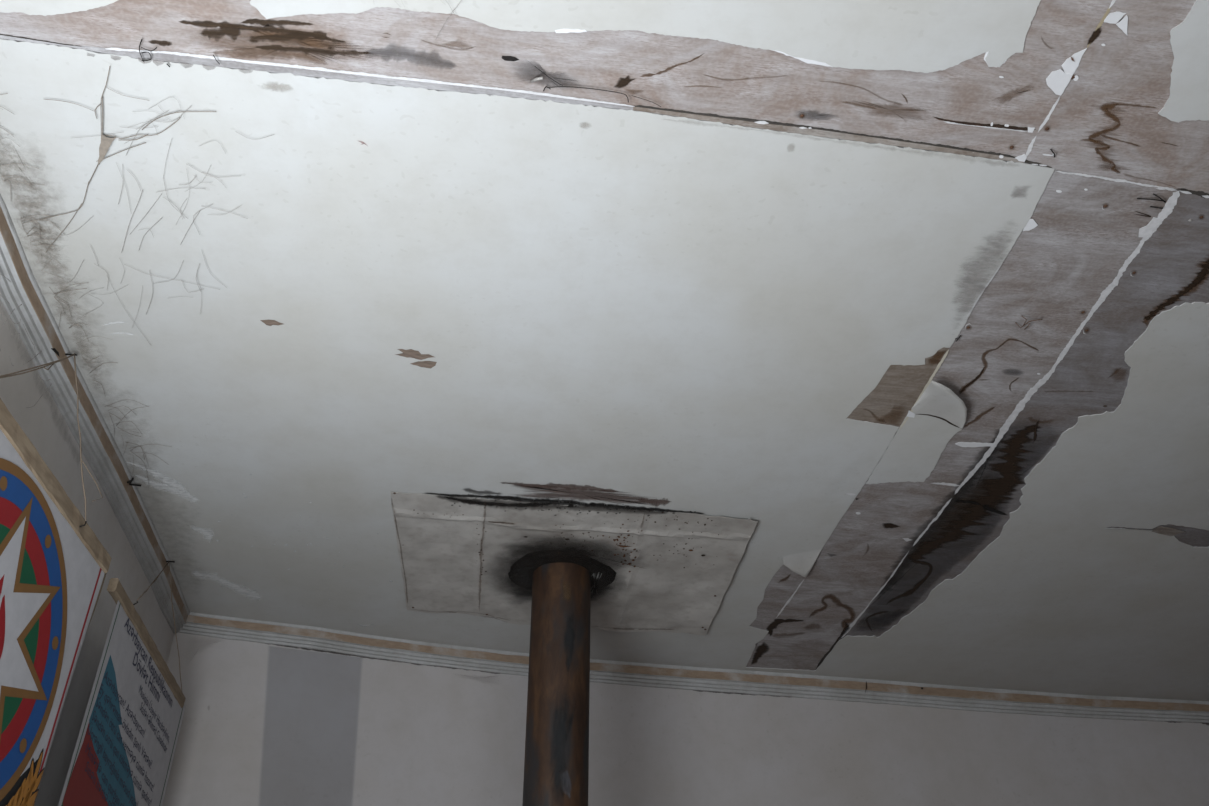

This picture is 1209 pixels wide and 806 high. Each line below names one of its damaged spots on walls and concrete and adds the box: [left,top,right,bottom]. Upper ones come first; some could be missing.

damp [180,19,371,55]
peeling [0,0,1112,162]
peeling [746,0,1209,670]
damp [465,483,616,494]
damp [639,498,670,506]
damp [752,421,1040,664]